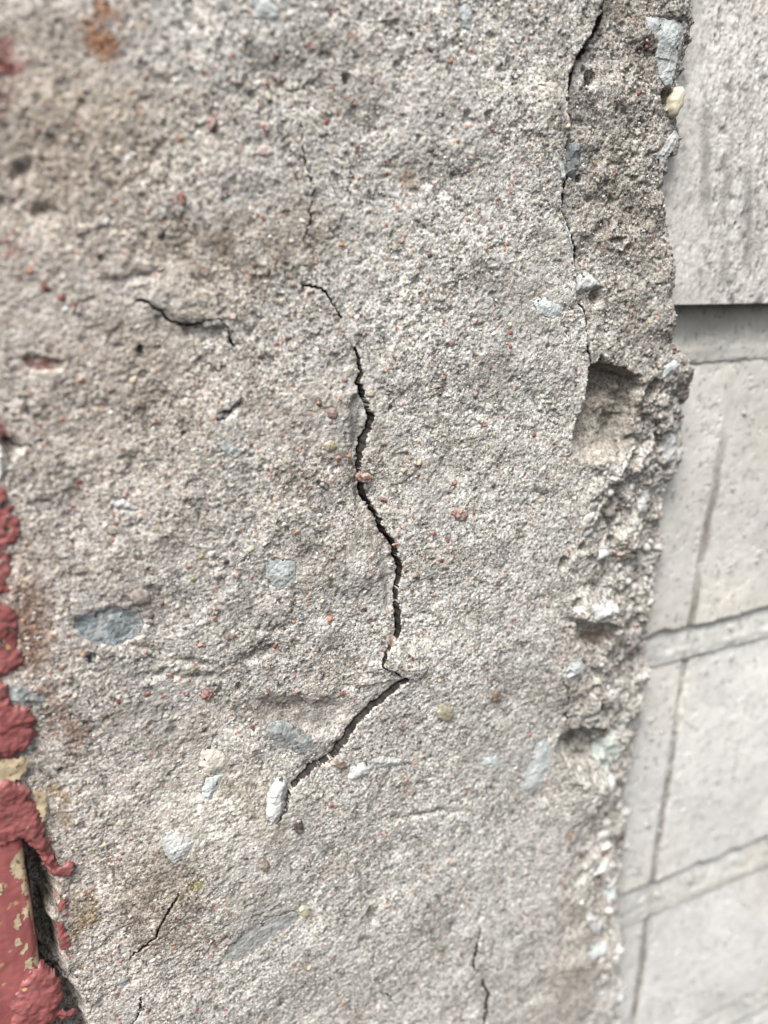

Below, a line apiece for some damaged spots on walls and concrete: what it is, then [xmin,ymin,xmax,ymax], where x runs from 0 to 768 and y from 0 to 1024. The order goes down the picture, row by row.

crack [565,1,604,146]
crack [132,299,235,347]
crack [302,284,342,319]
crack [561,176,591,363]
crack [277,347,410,824]
spalling [553,356,664,990]
peeling [0,756,30,783]
peeling [32,790,48,822]
peeling [9,847,39,971]
peeling [52,892,72,960]
crack [130,893,179,960]